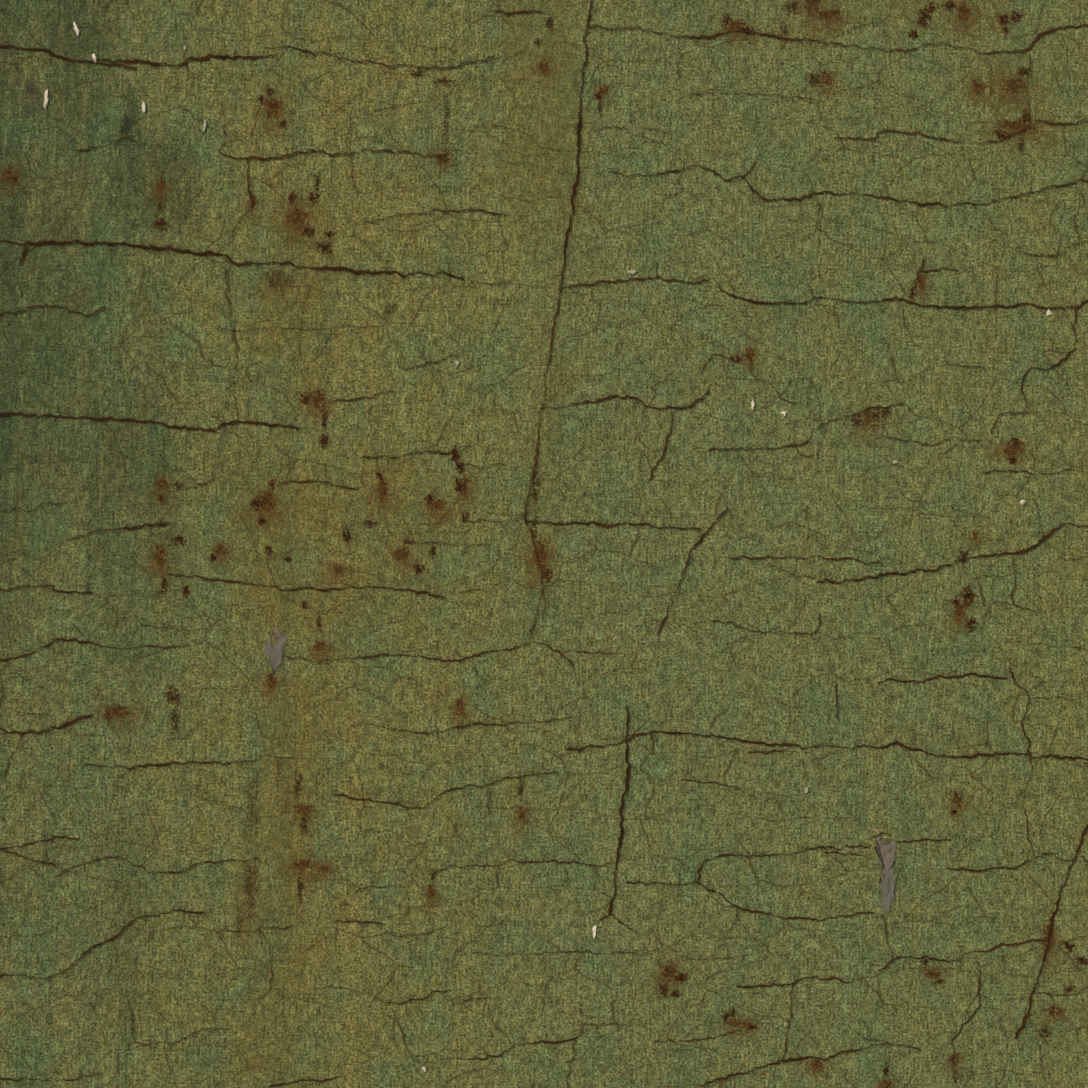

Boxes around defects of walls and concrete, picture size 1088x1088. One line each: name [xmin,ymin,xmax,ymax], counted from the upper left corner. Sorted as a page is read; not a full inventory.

rust [908,0,970,39]
rust [999,11,1024,36]
rust [992,108,1036,152]
rust [285,171,335,255]
rust [450,445,470,523]
rust [393,538,436,575]
rust [952,585,977,632]
peeling [265,628,286,675]
crack [315,665,1088,1088]
peeling [872,829,896,911]
rust [1043,910,1088,965]
rust [659,962,687,998]